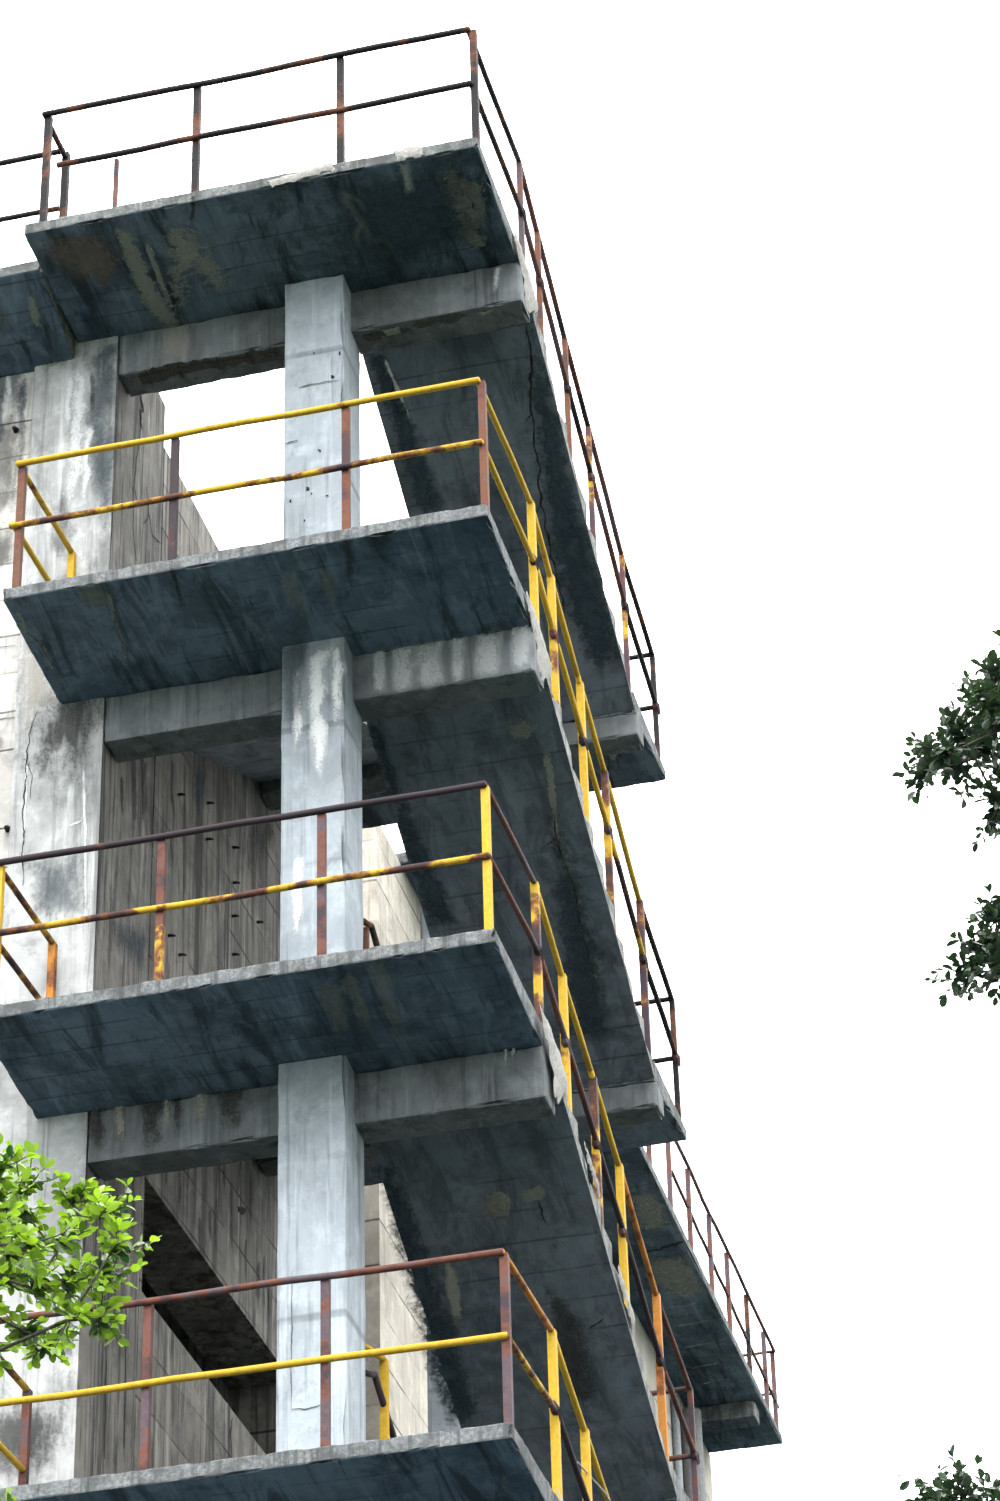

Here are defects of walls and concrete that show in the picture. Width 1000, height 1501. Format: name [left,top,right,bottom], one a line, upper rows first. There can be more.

leakage [0,376,24,432]
leakage [48,347,115,502]
leakage [371,1166,478,1426]
leakage [547,1291,595,1400]